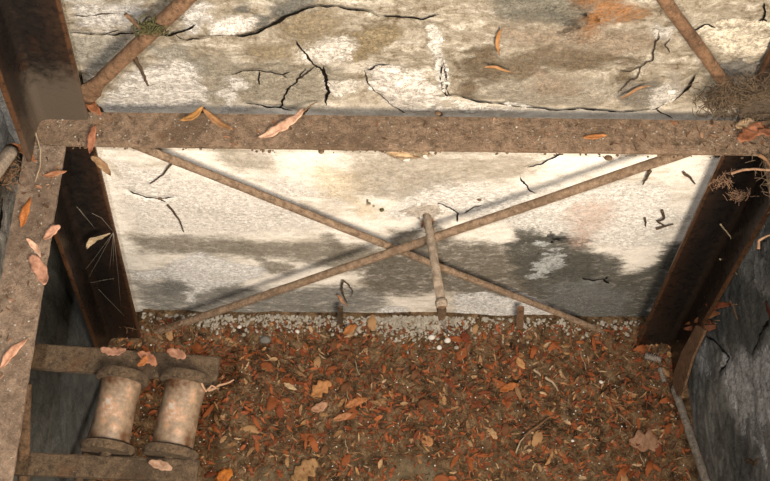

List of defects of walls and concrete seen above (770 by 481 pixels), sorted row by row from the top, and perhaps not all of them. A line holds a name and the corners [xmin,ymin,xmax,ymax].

damp [68,0,146,69]
crack [231,40,331,111]
crack [160,6,439,41]
crack [364,64,407,114]
damp [103,0,681,114]
crack [439,61,696,118]
crack [618,31,670,92]
damp [110,149,689,317]